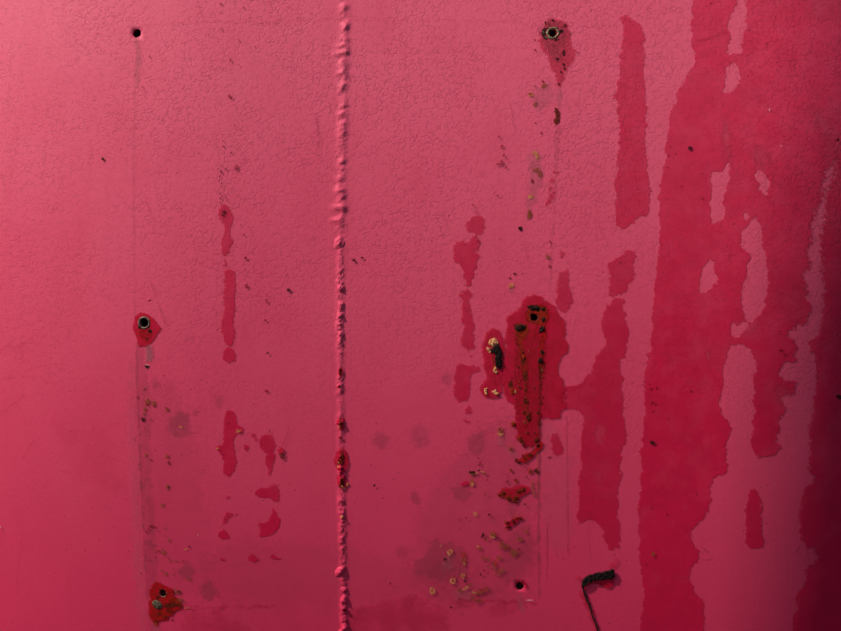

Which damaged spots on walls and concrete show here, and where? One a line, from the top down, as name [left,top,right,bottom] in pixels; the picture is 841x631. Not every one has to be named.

rust [497,294,569,505]
rust [476,513,528,575]
rust [148,549,187,626]